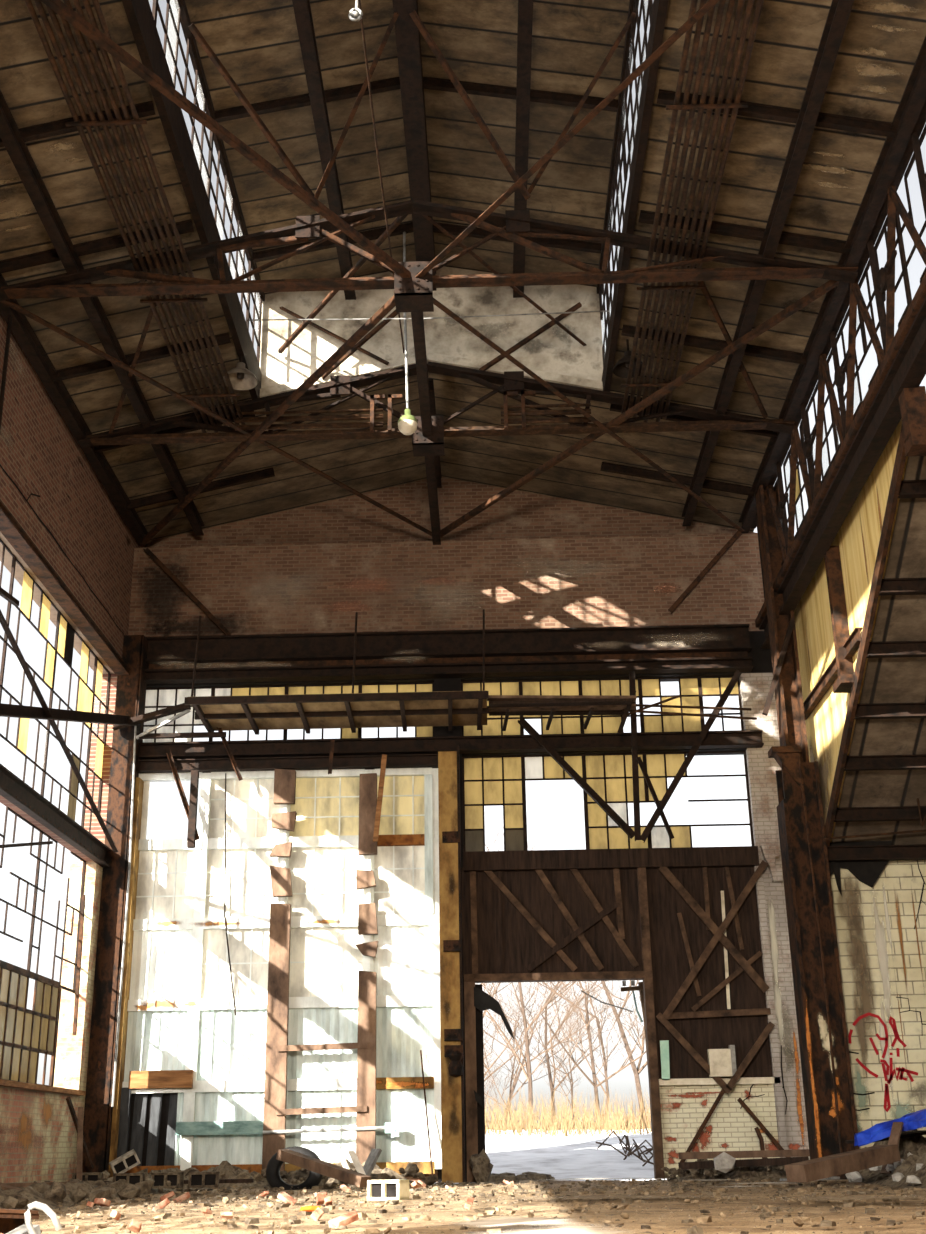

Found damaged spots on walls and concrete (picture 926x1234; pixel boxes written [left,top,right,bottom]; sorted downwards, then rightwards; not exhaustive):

damp [835,880,892,1107]
peeling [668,1090,752,1109]
peeling [664,1125,729,1164]